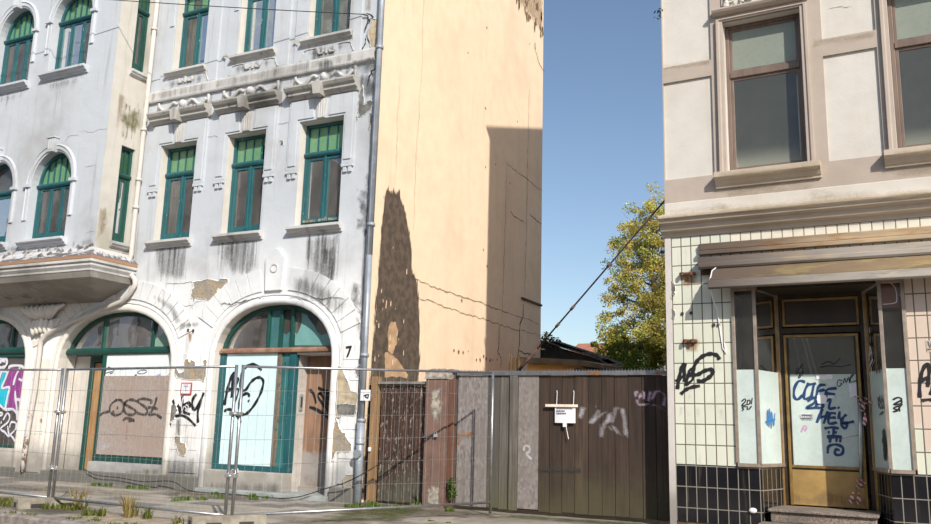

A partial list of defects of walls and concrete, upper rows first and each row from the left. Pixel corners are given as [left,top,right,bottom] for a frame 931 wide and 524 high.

spalling [516,0,543,37]
spalling [190,278,229,302]
crack [416,204,540,358]
peeling [331,187,420,500]
spalling [173,358,208,382]